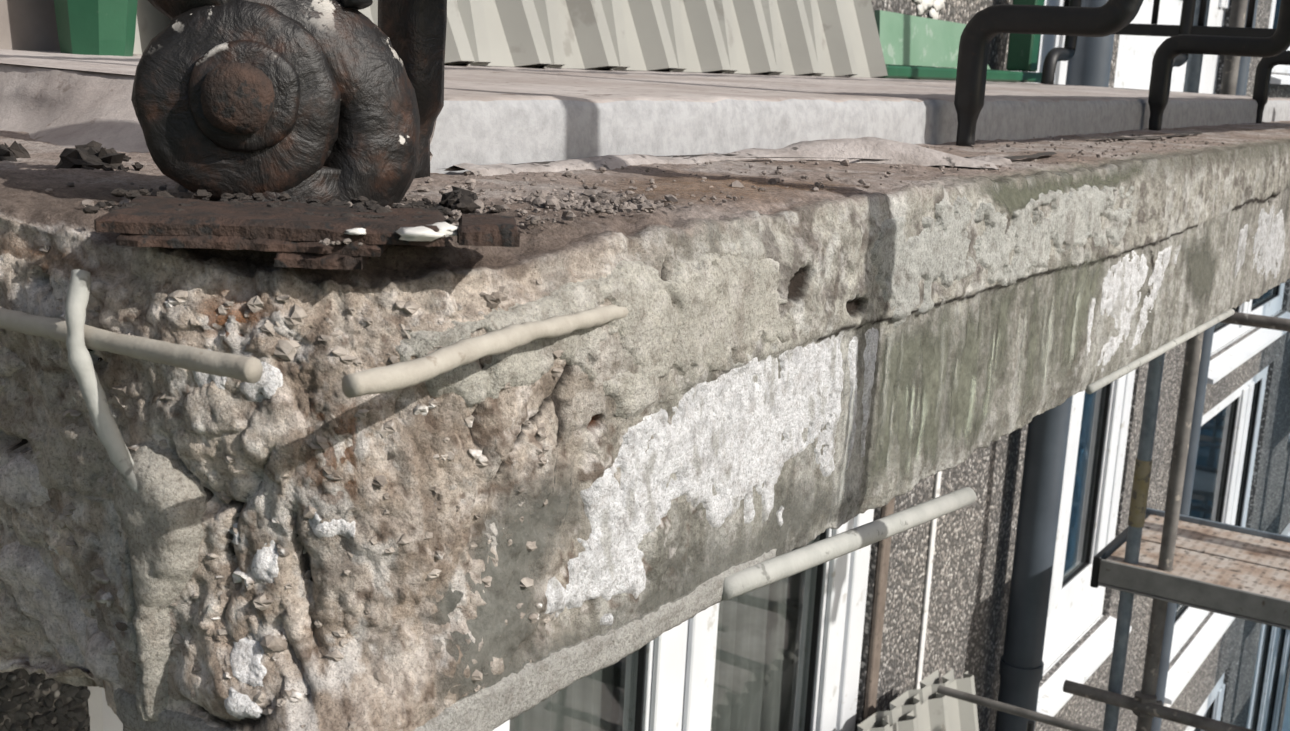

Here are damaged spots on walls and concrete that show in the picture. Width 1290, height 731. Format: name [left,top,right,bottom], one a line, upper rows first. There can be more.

water stain [1070,294,1080,356]
water stain [1186,246,1216,301]
spalling [0,245,629,731]
water stain [435,485,576,698]
peeling [499,327,879,637]
water stain [600,385,855,635]